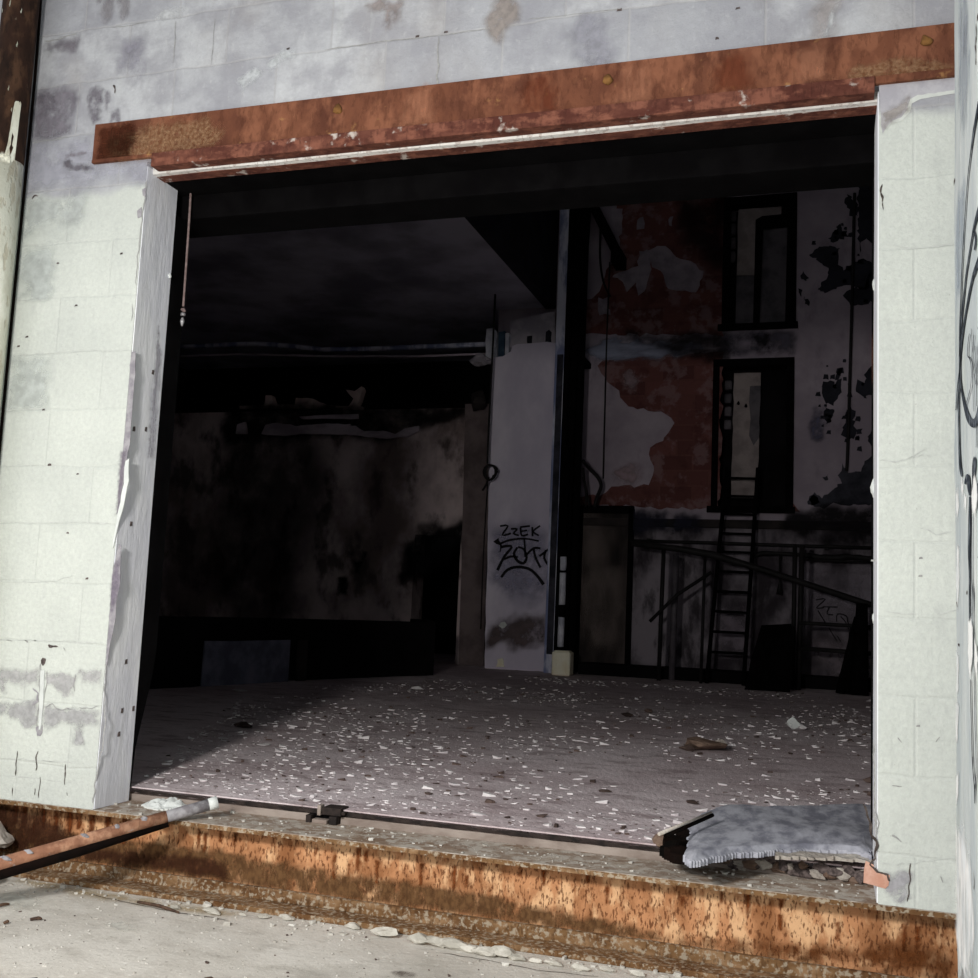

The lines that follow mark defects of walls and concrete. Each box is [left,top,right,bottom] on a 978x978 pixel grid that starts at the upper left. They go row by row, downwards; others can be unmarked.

water stain [36,89,77,138]
water stain [89,89,119,123]
rust [97,123,217,159]
spalling [586,198,724,337]
peeling [809,186,872,306]
spalling [580,353,724,510]
peeling [807,359,872,507]
water stain [0,701,96,744]
water stain [0,671,100,696]
spalling [863,804,910,902]
crack [873,742,956,901]
rust [758,945,950,974]